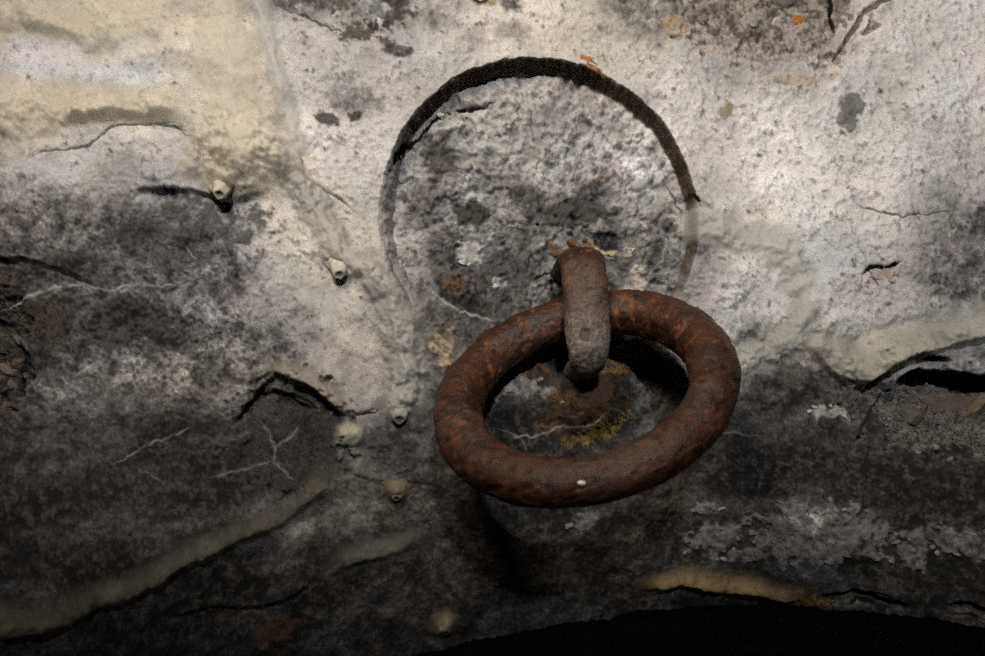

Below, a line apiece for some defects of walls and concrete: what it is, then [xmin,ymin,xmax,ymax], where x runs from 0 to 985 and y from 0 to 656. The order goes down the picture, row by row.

spalling [672,0,880,70]
crack [827,0,890,62]
crack [41,122,193,151]
crack [386,101,495,184]
water stain [121,184,273,271]
crack [667,187,713,246]
water stain [83,295,194,354]
rust [429,329,453,366]
crack [235,371,378,423]
rust [511,342,634,450]
crack [857,385,889,437]
spalling [807,355,985,462]